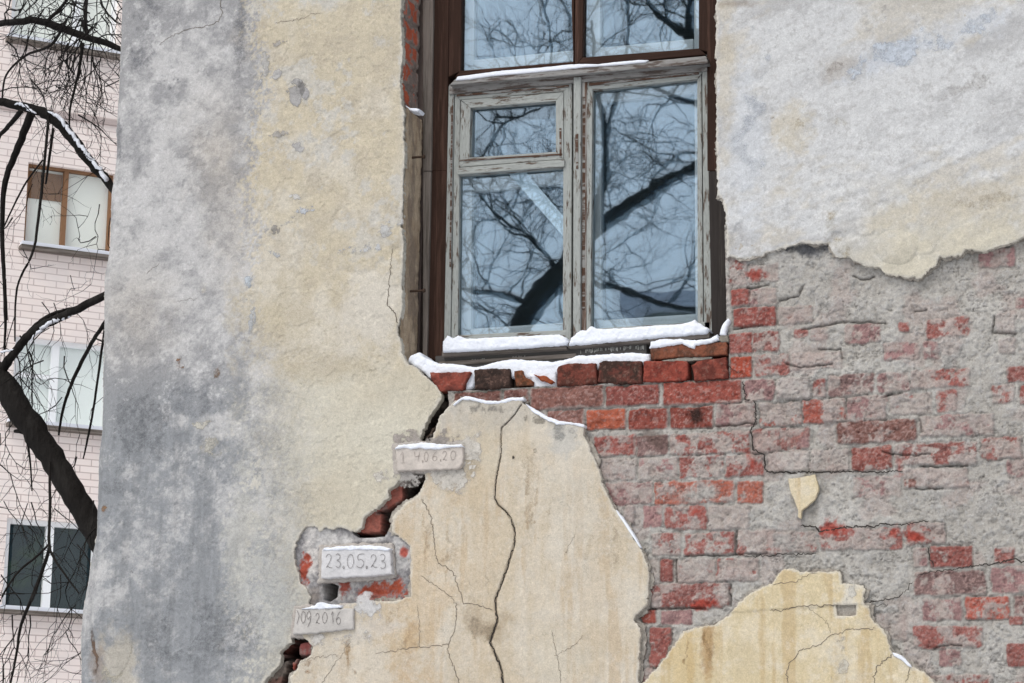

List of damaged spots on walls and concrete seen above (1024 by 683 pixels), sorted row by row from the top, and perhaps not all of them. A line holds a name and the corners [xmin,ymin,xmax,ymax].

flaking render [401,0,421,115]
crack [387,251,398,323]
flaking render [426,224,1024,683]
crack [728,357,903,474]
flaking render [295,526,411,606]
crack [358,399,522,683]
crack [740,520,1024,681]
crack [268,638,350,683]